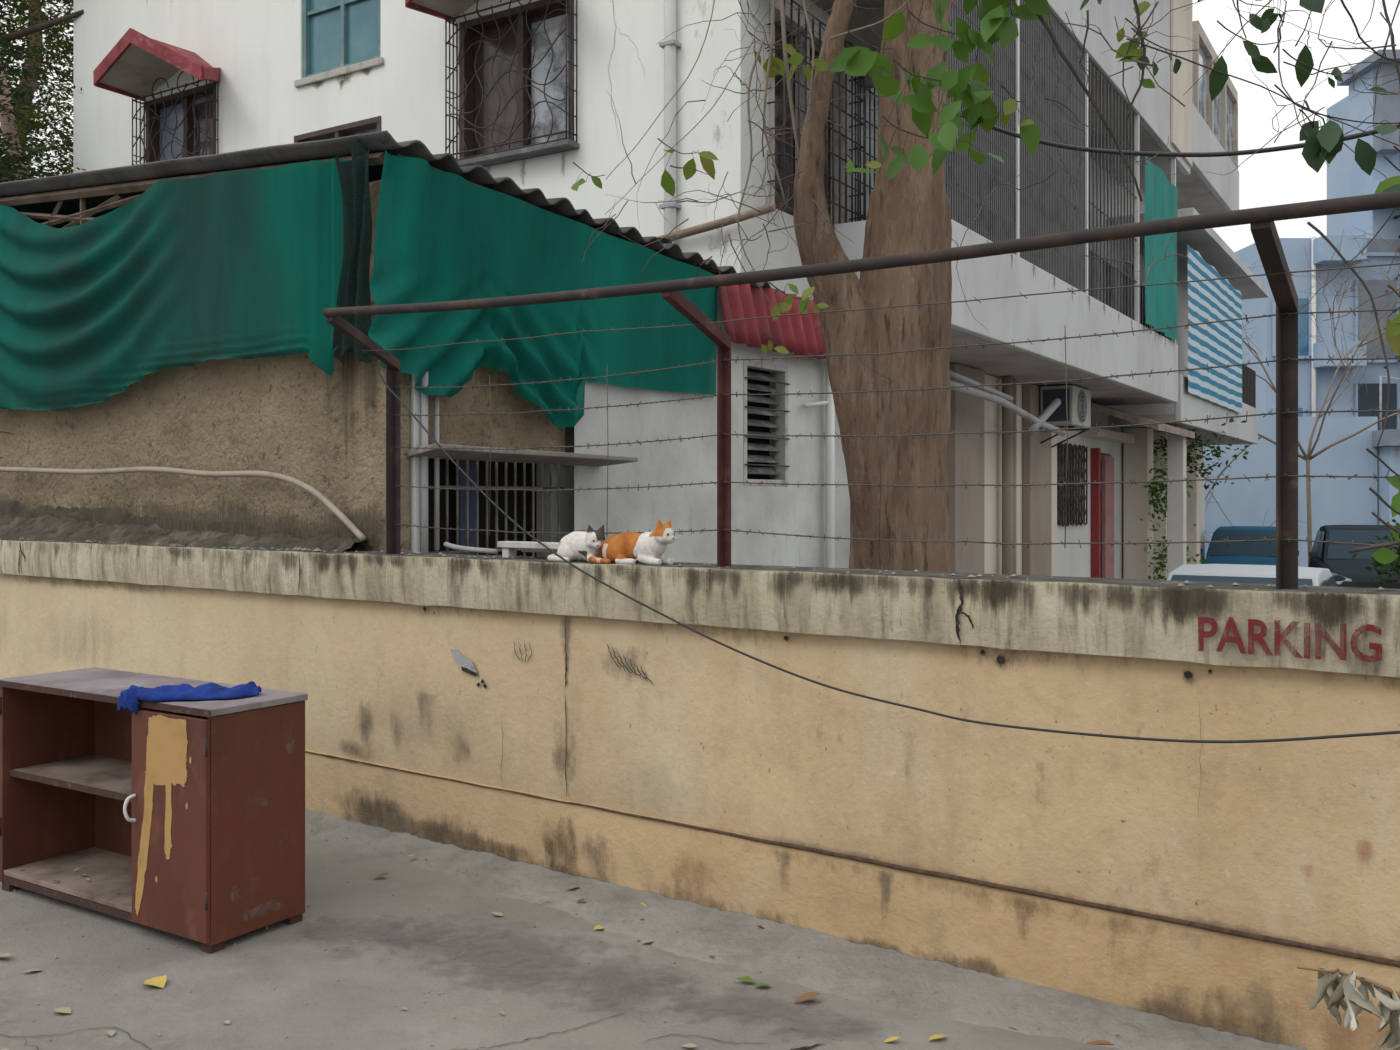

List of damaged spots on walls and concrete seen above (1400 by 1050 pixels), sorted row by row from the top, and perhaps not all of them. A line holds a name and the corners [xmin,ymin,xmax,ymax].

damp [280,553,430,574]
crack [955,579,974,643]
damp [908,578,1223,622]
damp [1378,599,1387,622]
damp [347,799,529,862]
damp [545,829,603,882]
damp [881,873,889,900]
damp [945,959,997,977]
crack [465,1012,626,1050]
crack [644,1034,821,1050]